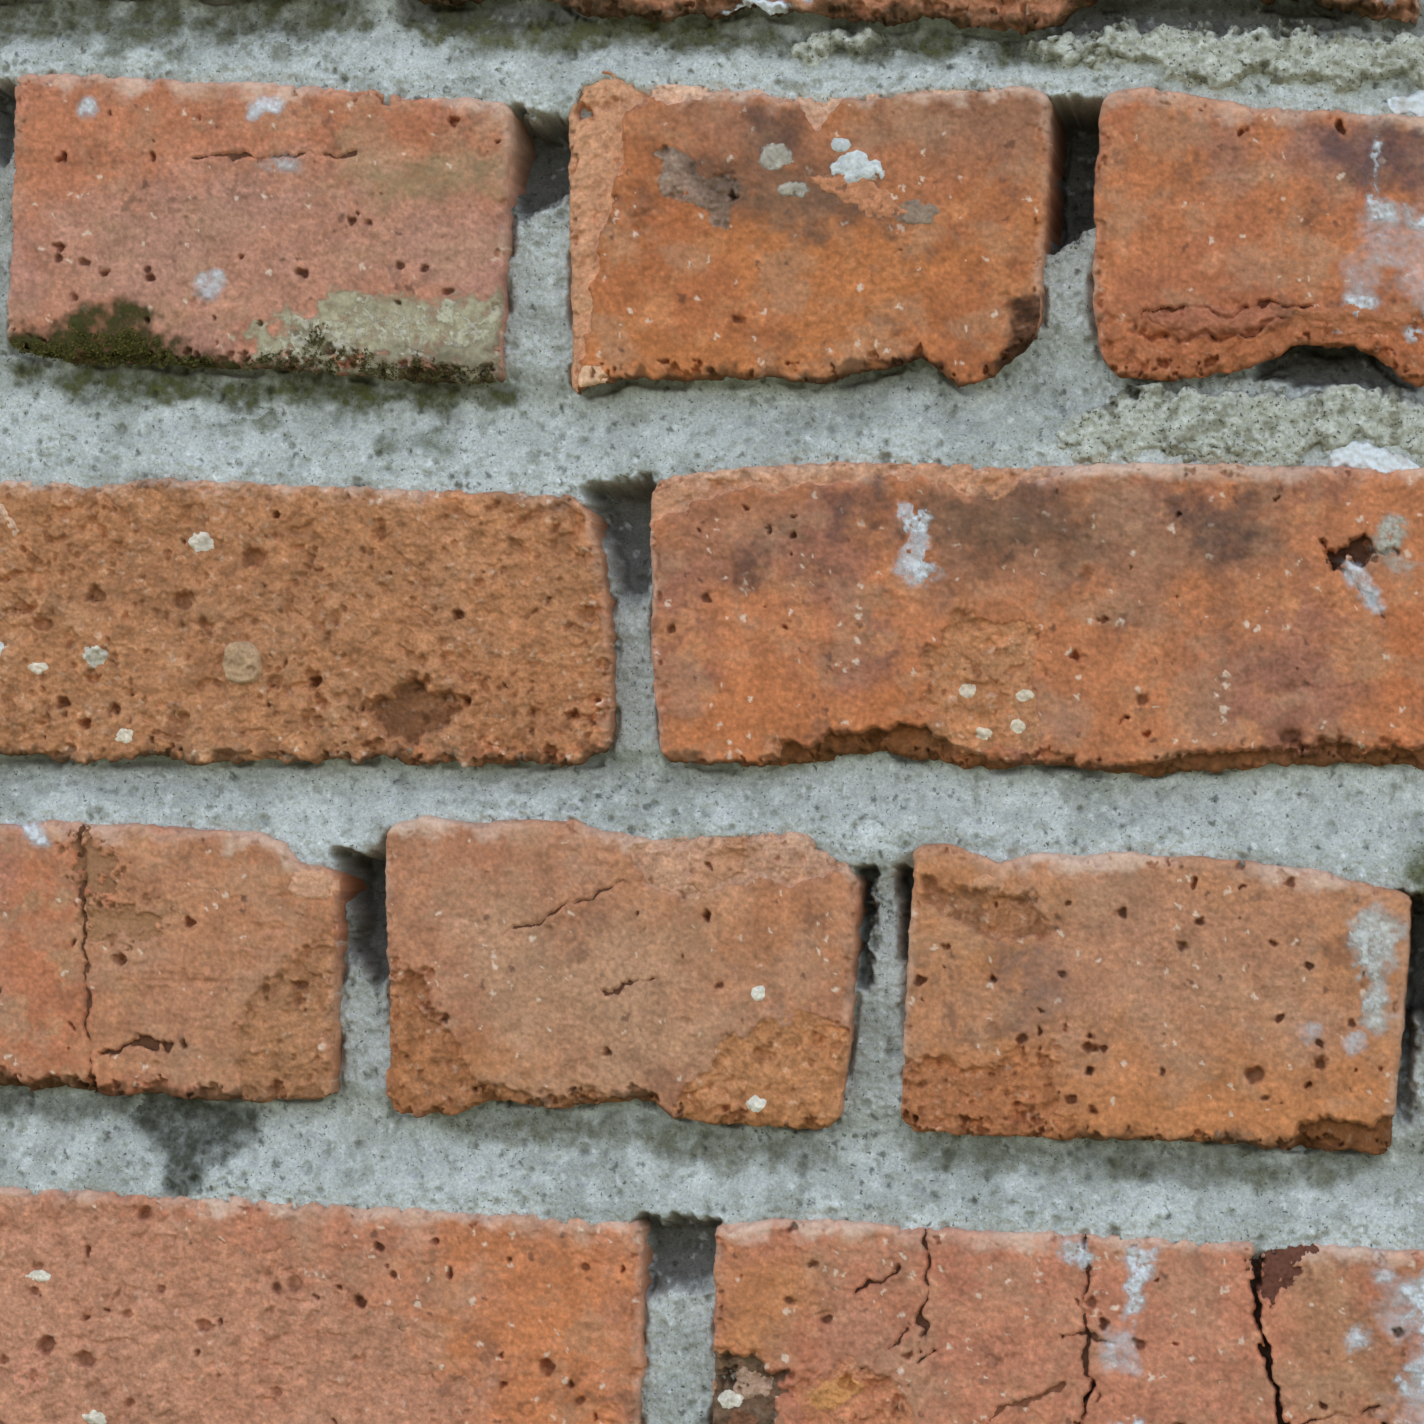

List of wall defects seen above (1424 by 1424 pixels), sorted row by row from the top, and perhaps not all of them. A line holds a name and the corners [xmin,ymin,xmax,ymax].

damp [723,0,788,16]
damp [9,300,241,370]
damp [1346,295,1376,318]
crack [512,879,623,929]
crack [57,824,174,1086]
crack [602,978,656,996]
crack [855,1228,936,1370]
crack [989,1234,1109,1424]
damp [1124,1245,1158,1314]
crack [1244,1243,1386,1424]
damp [1377,1270,1424,1334]
spalling [712,1350,914,1424]